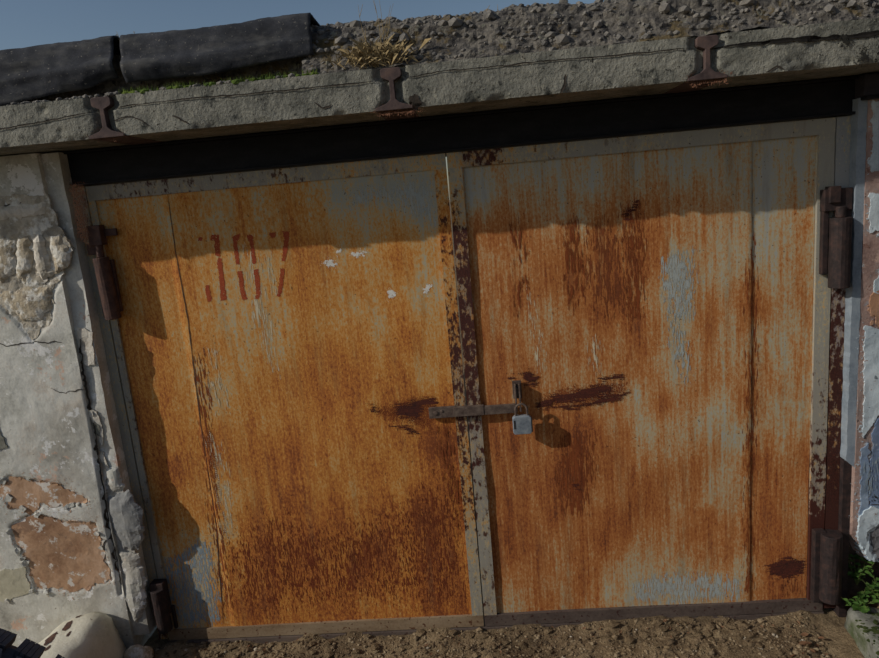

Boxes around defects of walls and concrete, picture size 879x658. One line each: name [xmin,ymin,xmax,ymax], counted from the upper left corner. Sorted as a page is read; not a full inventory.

crack [403,48,690,106]
crack [712,30,879,49]
peeling [864,100,879,236]
spalling [0,194,73,340]
corrosion [560,194,649,334]
peeling [0,472,119,603]
crack [0,339,122,589]
peeling [76,327,96,366]
corrosion [189,349,469,623]
corrosion [505,365,633,414]
corrosion [741,235,761,593]
peeling [831,275,879,617]